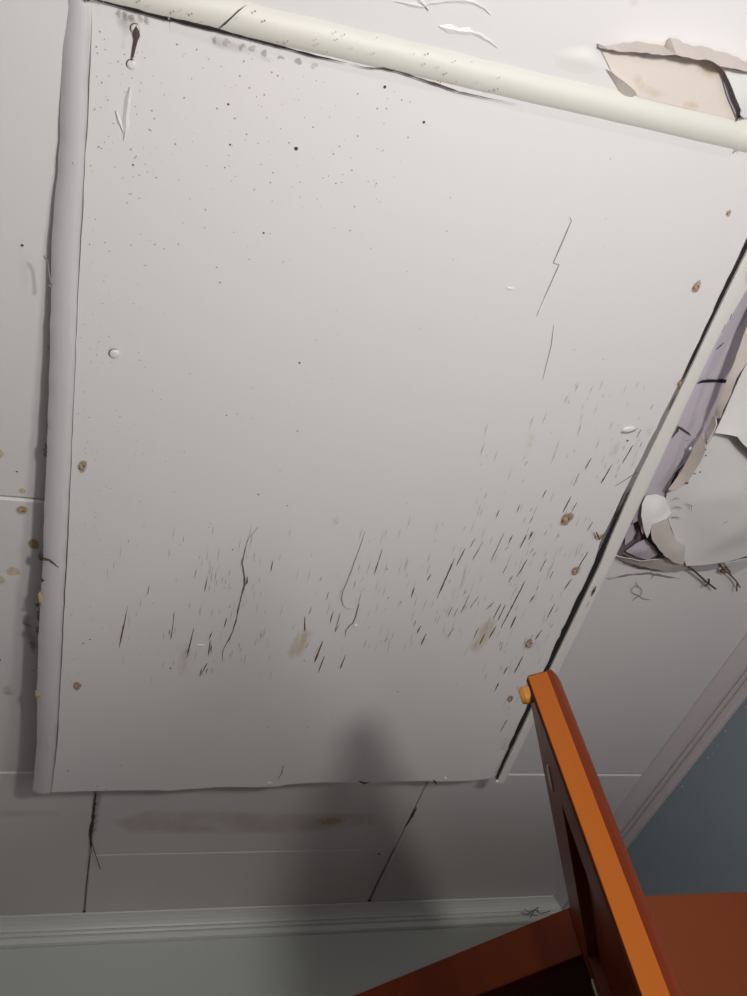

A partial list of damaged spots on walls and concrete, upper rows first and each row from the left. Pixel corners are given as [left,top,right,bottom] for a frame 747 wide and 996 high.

crack [88,0,514,104]
peeling [598,38,747,121]
crack [536,218,572,377]
peeling [632,292,747,575]
crack [163,242,747,779]
crack [119,588,149,658]
crack [84,794,101,910]